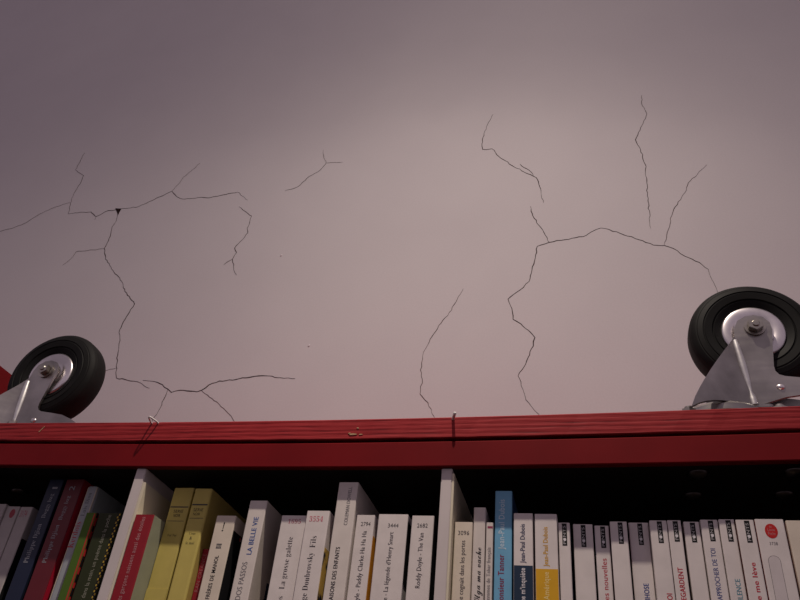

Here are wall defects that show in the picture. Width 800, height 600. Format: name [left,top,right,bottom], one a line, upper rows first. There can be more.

crack [2,154,295,421]
crack [420,296,459,418]
crack [482,96,718,408]